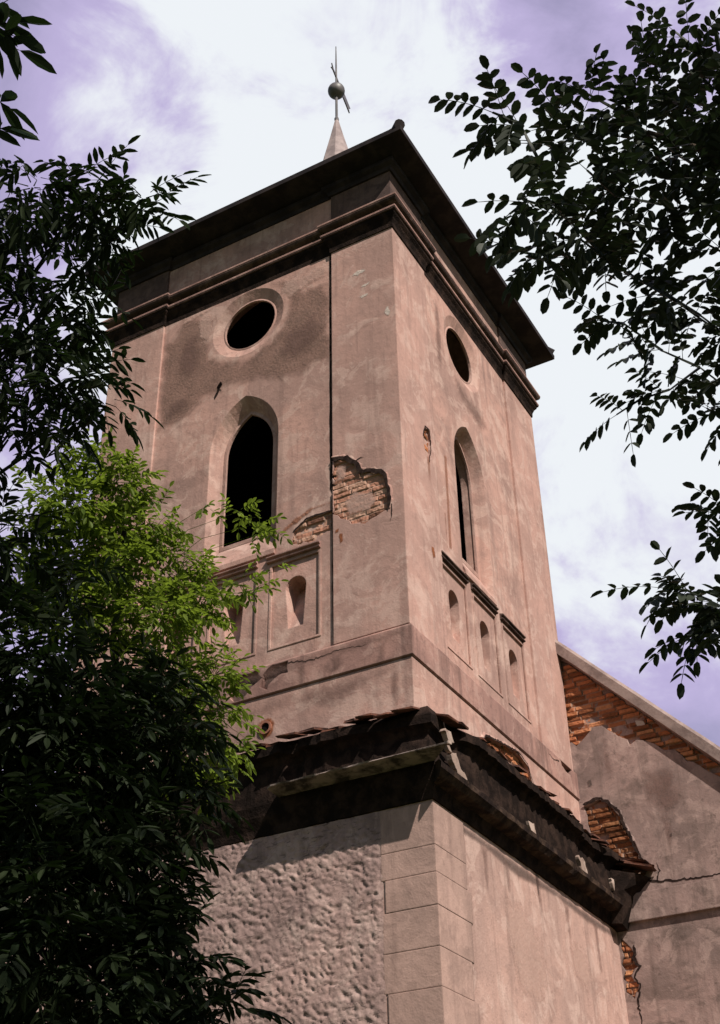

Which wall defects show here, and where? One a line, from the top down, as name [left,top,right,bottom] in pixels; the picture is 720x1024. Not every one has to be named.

spalling [283,454,394,545]
spalling [481,732,534,784]
spalling [561,665,720,776]
spalling [583,780,646,876]
crack [649,862,720,883]